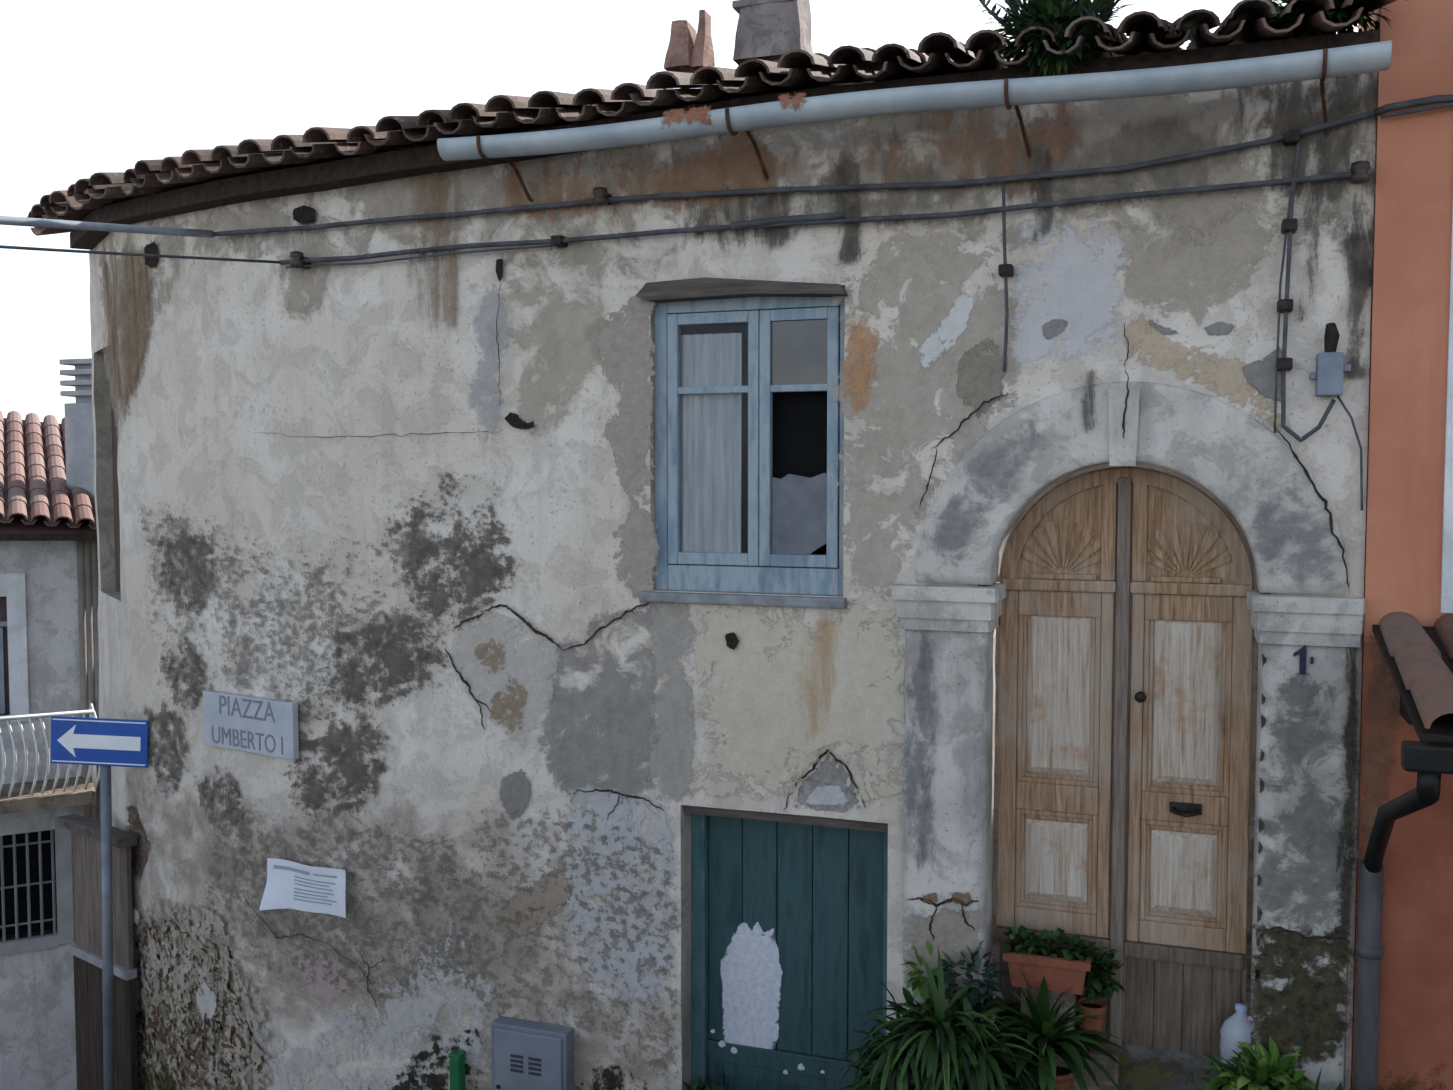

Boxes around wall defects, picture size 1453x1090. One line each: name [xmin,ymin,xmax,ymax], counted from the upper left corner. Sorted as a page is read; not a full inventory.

water stain [102,246,150,411]
flaking render [99,197,332,439]
flaking render [344,86,1283,602]
crack [920,393,1008,505]
crack [1273,423,1350,589]
water stain [140,472,682,1090]
crack [444,602,651,730]
flaking render [497,783,678,1017]
water stain [1249,637,1400,1069]